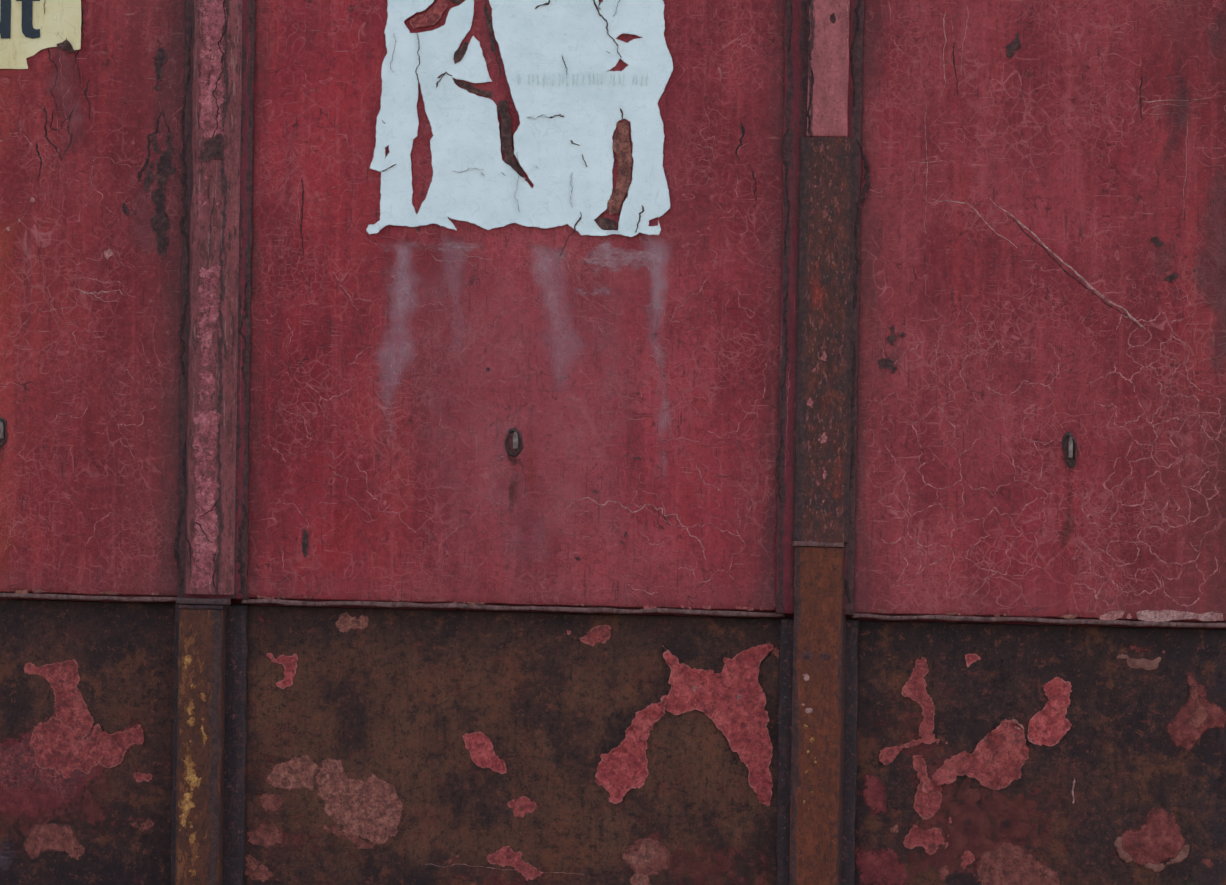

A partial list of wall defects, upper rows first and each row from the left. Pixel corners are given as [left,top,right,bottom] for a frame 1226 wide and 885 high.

peeling [198,0,227,143]
crack [849,0,862,107]
crack [0,0,227,386]
peeling [189,262,222,590]
crack [174,441,309,595]
crack [841,138,1062,603]
crack [1071,312,1225,607]
peeling [0,659,144,860]
rust [245,854,277,882]
peeling [246,755,403,849]
peeling [595,644,780,809]
peeling [855,656,1073,885]